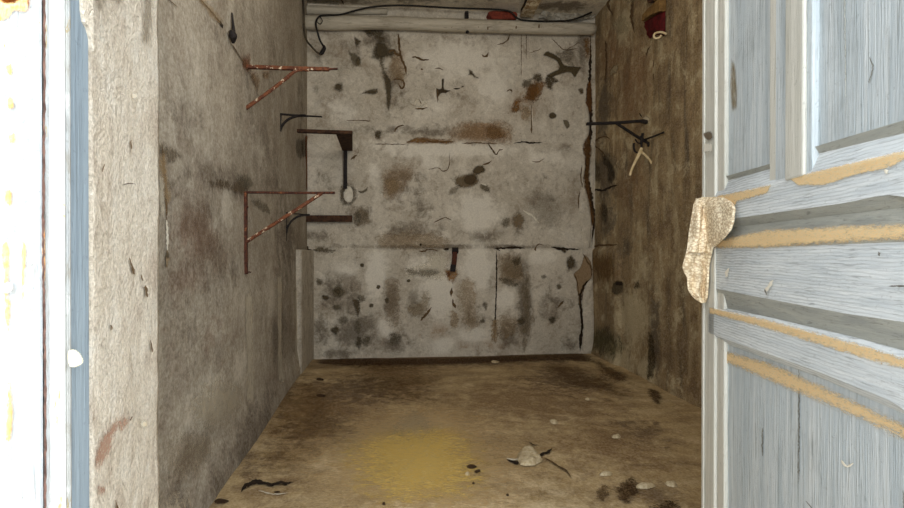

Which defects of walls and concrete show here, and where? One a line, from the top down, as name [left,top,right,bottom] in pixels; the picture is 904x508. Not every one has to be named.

peeling [0,0,29,21]
crack [607,0,654,79]
rust [512,80,546,118]
damp [455,126,504,192]
crack [491,34,617,349]
peeling [574,254,593,305]
damp [317,255,626,381]
damp [647,334,661,403]
rust [96,417,130,465]
damp [315,407,517,508]